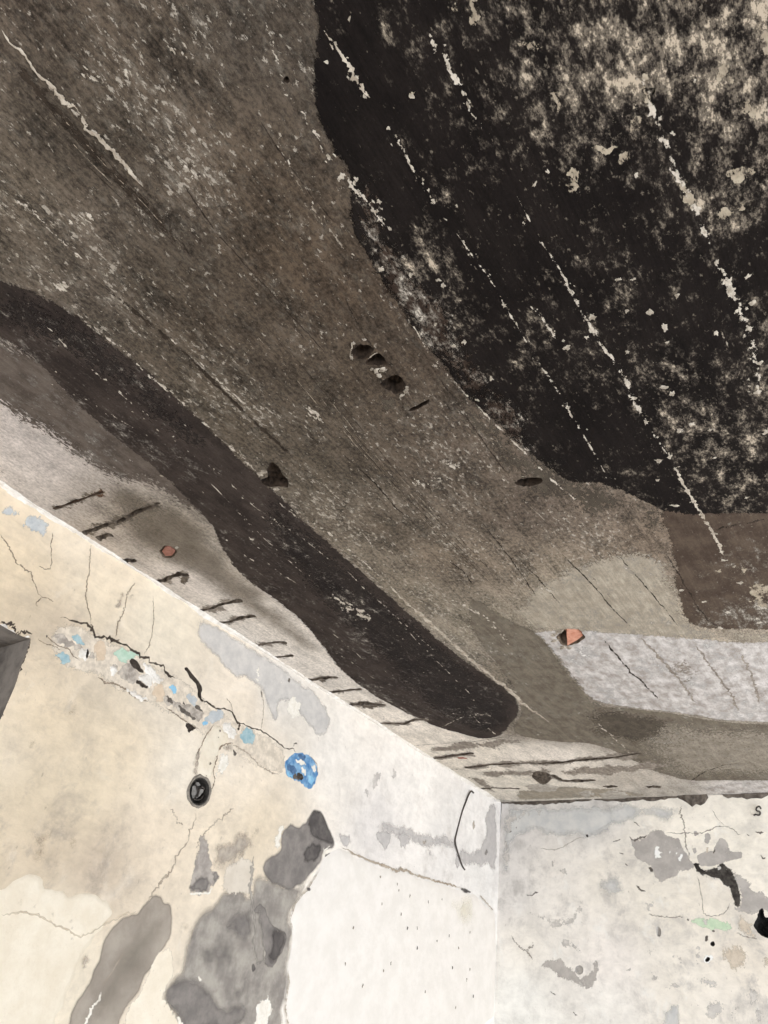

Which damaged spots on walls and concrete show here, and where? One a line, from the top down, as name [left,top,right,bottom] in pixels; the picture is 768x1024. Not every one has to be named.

spalling [350,338,430,412]
leakage [0,338,278,620]
spalling [251,462,289,491]
flaking render [130,658,148,688]
crack [0,533,297,752]
flaking render [198,598,330,735]
leakage [166,811,334,1024]
flaking render [631,830,742,882]
crack [650,806,741,918]